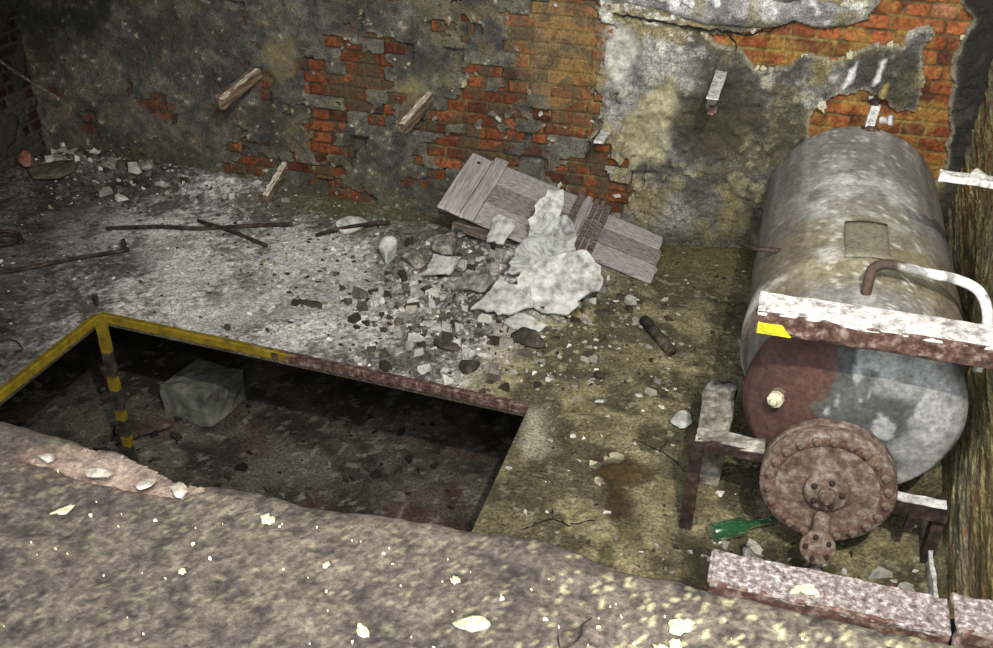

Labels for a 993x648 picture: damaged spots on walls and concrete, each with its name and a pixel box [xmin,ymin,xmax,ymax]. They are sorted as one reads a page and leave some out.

flaking render [223,32,407,202]
flaking render [413,0,633,213]
flaking render [700,0,972,179]